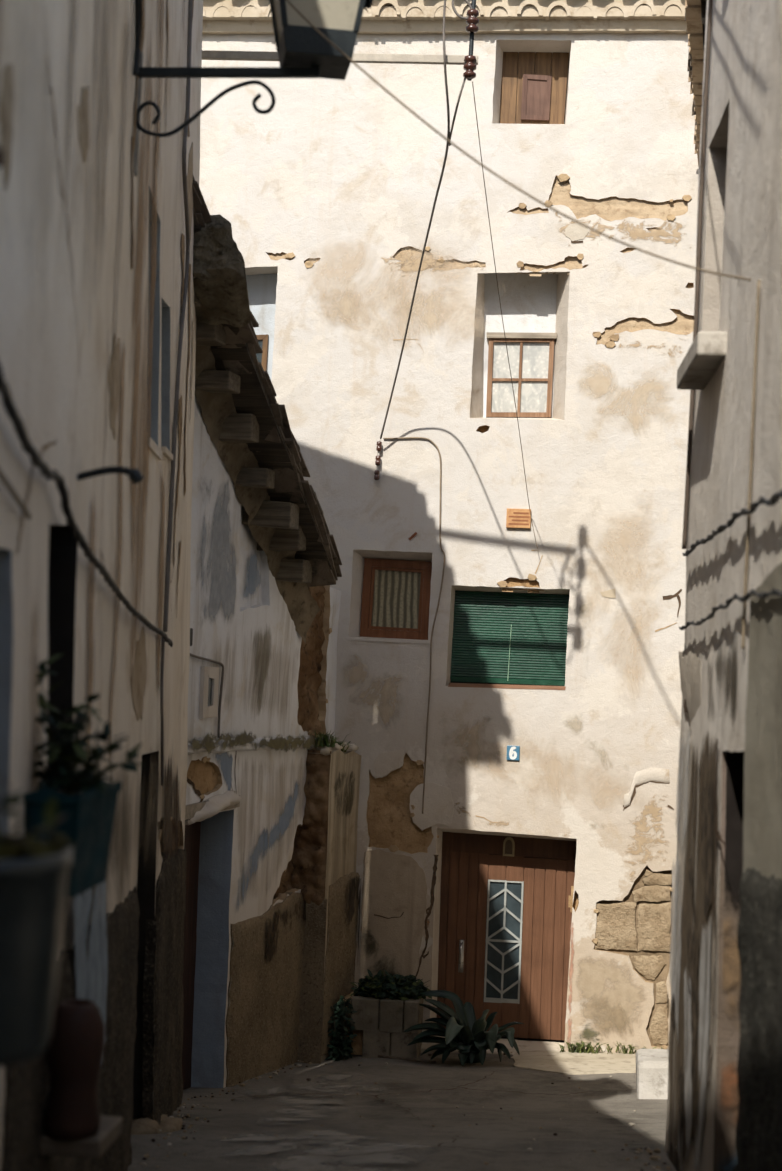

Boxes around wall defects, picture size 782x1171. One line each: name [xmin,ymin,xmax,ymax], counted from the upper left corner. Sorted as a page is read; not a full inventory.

flaking render [507,173,692,231]
flaking render [392,246,486,271]
flaking render [516,253,588,276]
flaking render [592,309,694,348]
flaking render [497,574,544,593]
flaking render [187,756,222,799]
flaking render [366,753,439,854]
flaking render [568,886,579,912]
flaking render [592,866,672,1049]